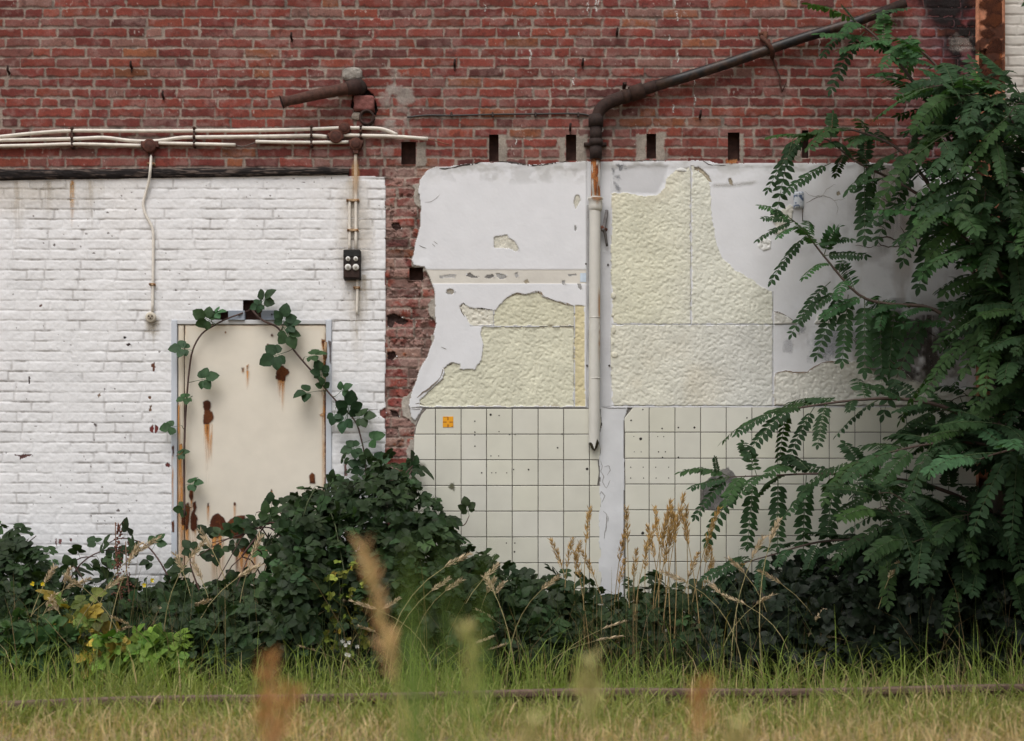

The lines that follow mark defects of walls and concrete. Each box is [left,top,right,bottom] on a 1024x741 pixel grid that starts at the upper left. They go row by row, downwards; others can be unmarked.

corrosion [591,158,601,200]
spalling [494,235,520,252]
hole [409,267,423,280]
spalling [388,314,409,328]
corrosion [276,365,289,391]
corrosion [172,400,259,569]